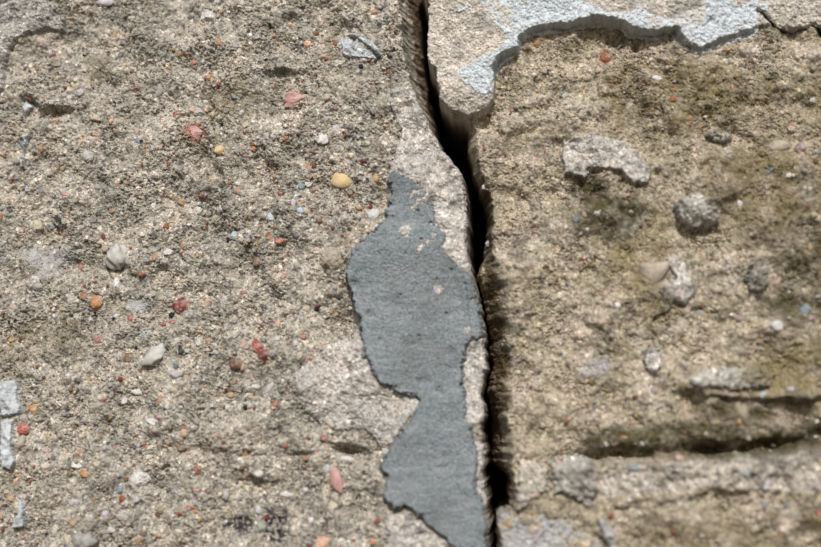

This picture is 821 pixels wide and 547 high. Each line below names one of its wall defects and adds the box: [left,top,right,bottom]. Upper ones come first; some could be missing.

peeling [422,0,821,123]
spalling [667,113,694,172]
flaking render [560,133,651,238]
peeling [284,87,585,547]
crack [408,0,511,547]
flaking render [652,253,694,317]
crack [683,385,821,410]
crack [597,438,793,469]
peeling [593,517,616,547]